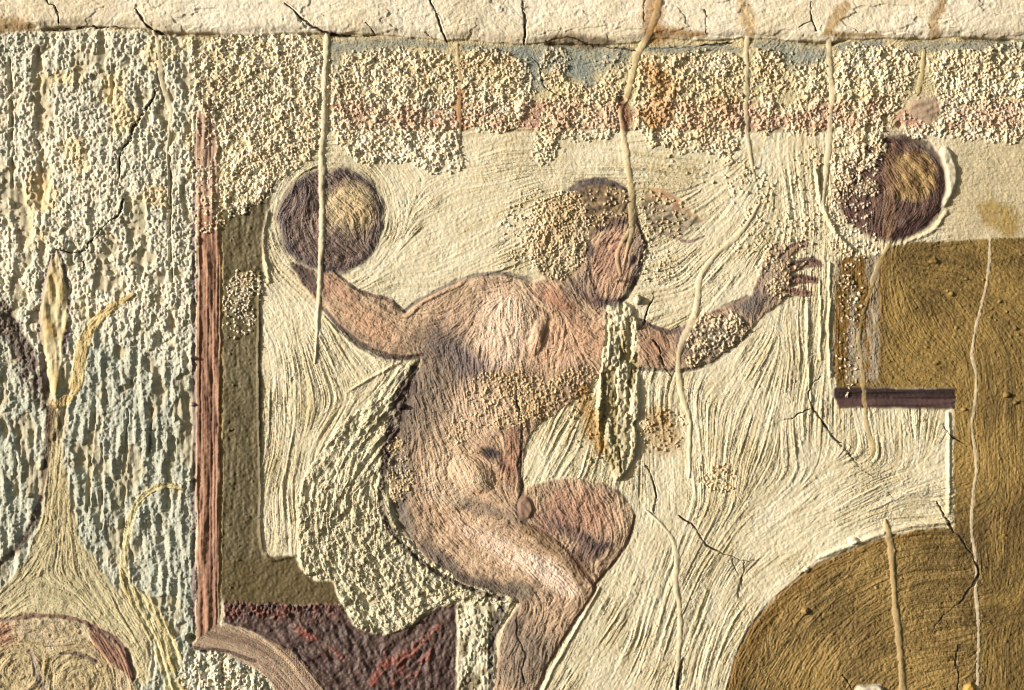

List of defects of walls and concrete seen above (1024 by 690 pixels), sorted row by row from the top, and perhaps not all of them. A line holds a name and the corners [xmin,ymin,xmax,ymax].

crack [46,0,165,35]
crack [284,2,376,37]
crack [426,0,448,42]
crack [56,89,156,274]
crack [785,376,898,503]
crack [646,465,757,599]
crack [934,502,979,628]